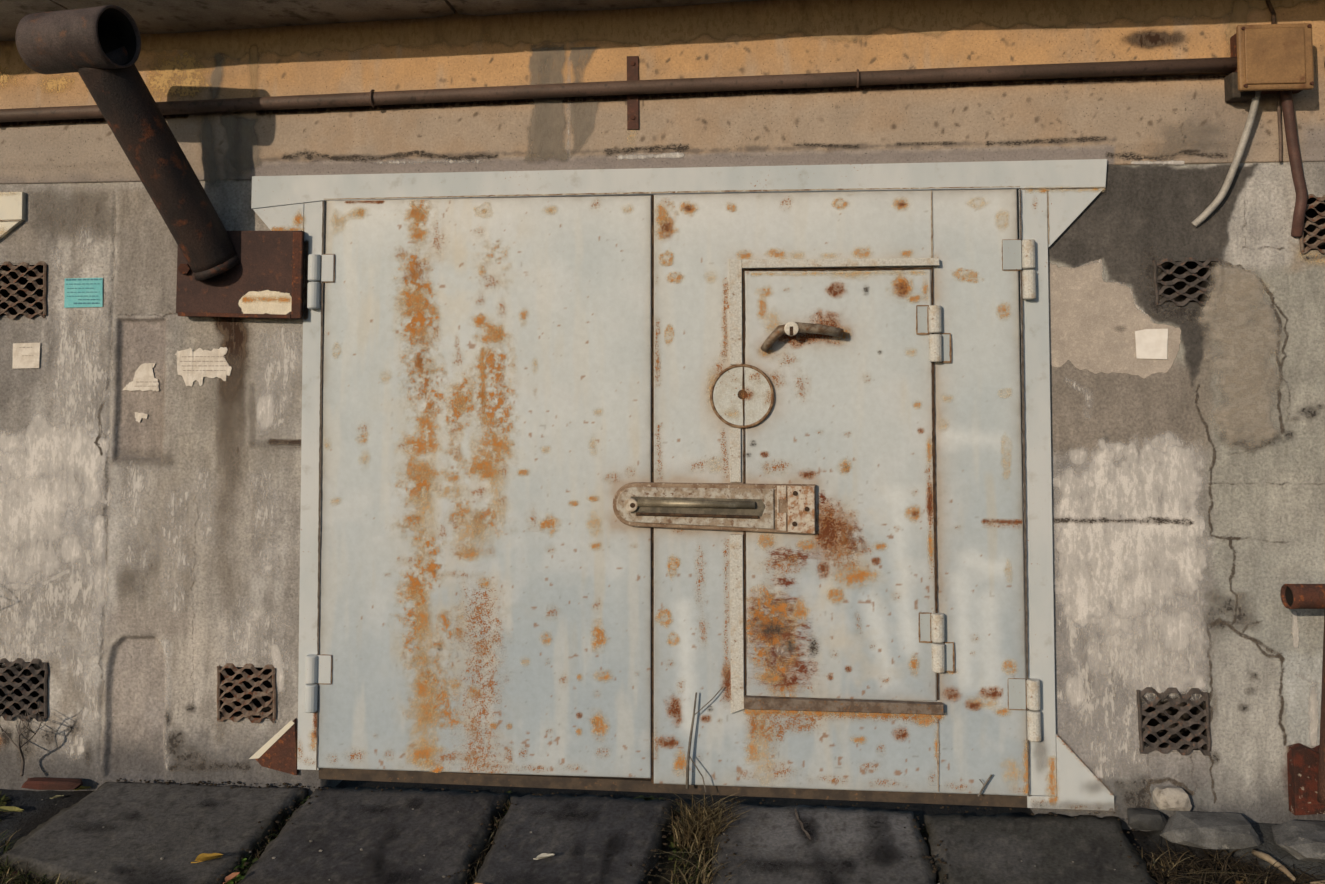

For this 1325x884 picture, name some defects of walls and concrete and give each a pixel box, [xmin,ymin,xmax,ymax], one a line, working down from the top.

damp [0,40,29,77]
damp [200,115,260,185]
damp [140,0,1316,161]
corrosion [271,214,309,320]
peeling [1048,259,1181,418]
crack [1211,212,1291,434]
corrosion [389,200,548,773]
corrosion [654,682,700,769]
corrosion [668,493,946,787]
corrosion [946,688,1008,715]
damp [1054,516,1193,525]
crack [1144,384,1316,809]